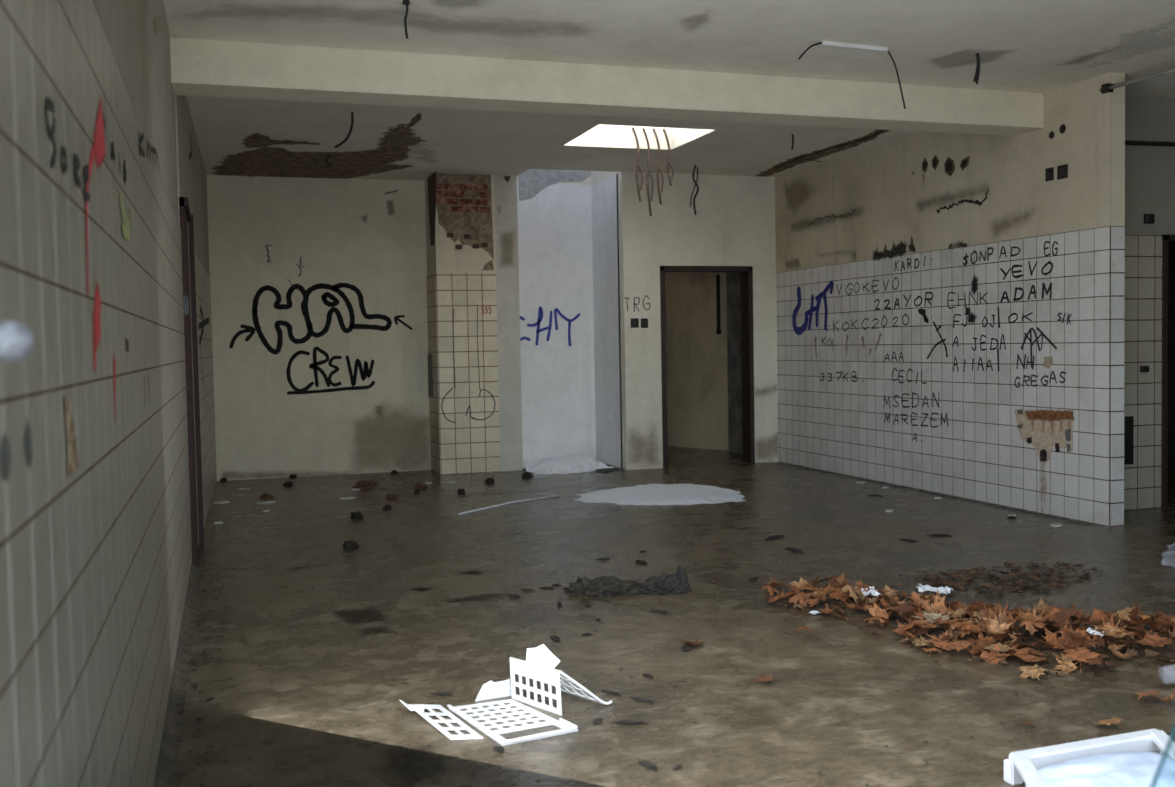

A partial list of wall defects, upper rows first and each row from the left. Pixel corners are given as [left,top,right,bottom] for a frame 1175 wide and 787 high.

spalling [211,113,426,179]
spalling [428,169,591,270]